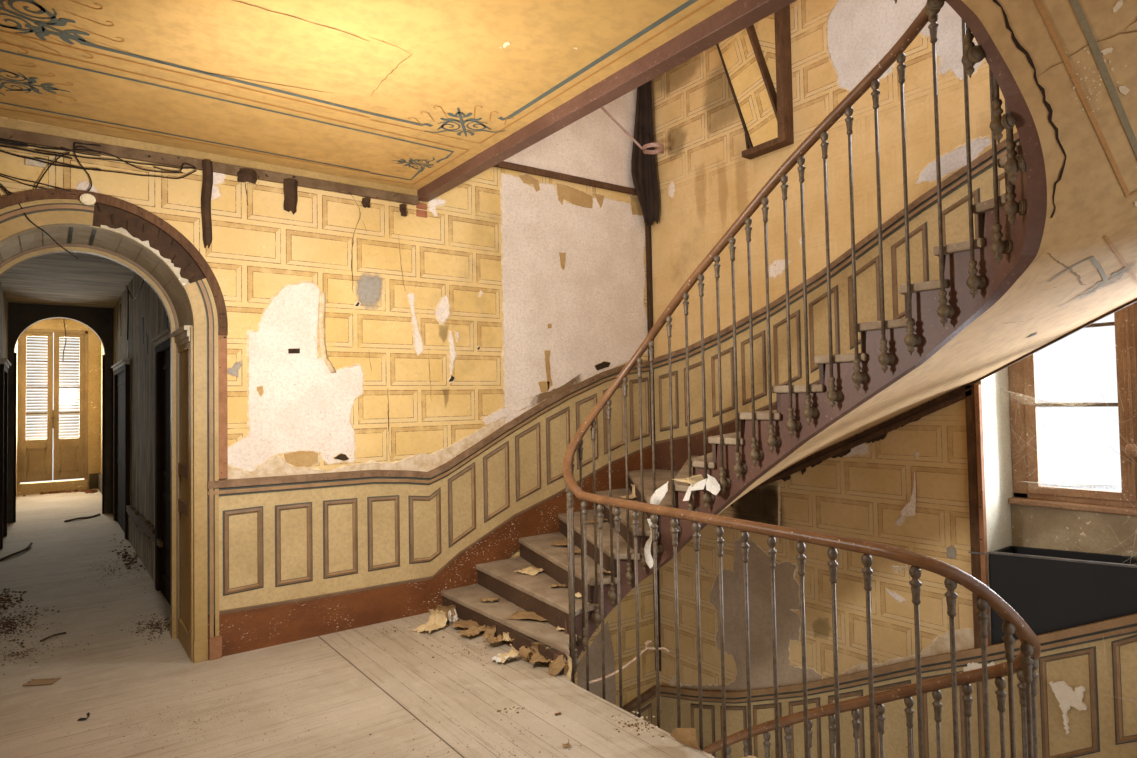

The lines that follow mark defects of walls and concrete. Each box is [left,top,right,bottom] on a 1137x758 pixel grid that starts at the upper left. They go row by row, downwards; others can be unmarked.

peeling [826,0,986,93]
crack [993,0,1137,218]
flaking render [1065,47,1130,112]
peeling [915,135,992,184]
peeling [223,88,648,480]
peeling [1049,680,1088,734]